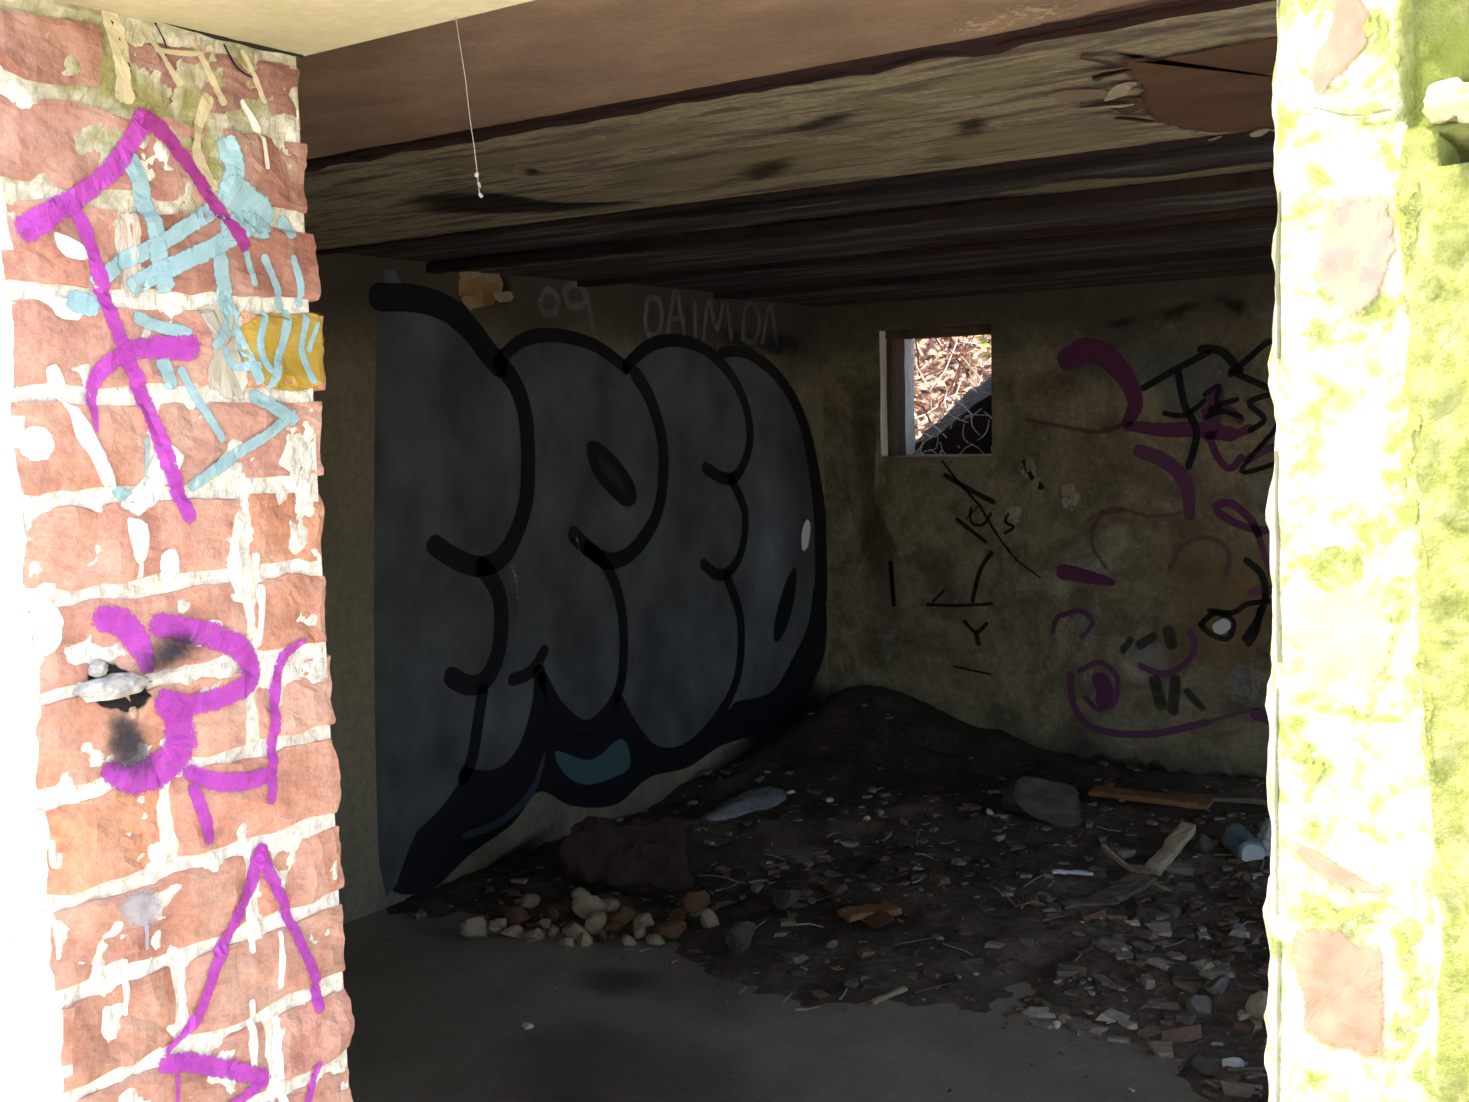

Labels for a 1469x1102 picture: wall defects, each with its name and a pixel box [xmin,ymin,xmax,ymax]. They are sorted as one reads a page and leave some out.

spalling [1045,37,1278,141]